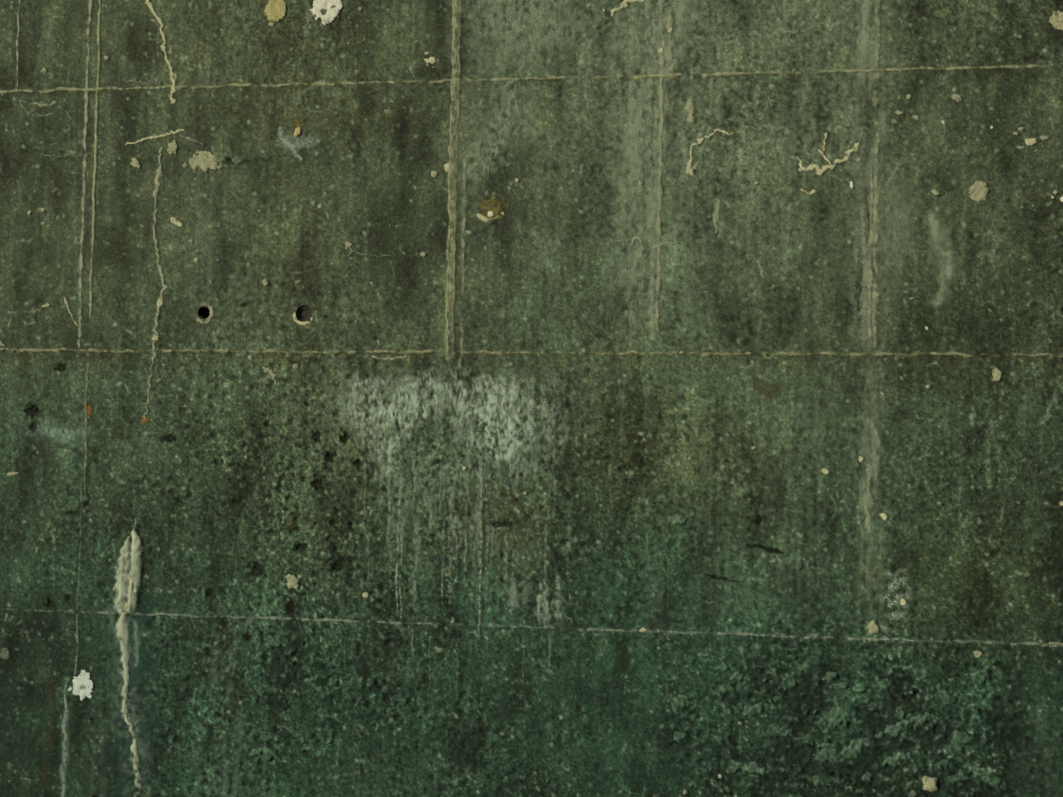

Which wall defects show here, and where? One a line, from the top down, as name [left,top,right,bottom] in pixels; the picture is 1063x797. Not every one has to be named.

crack [119,0,202,418]
crack [602,0,699,73]
crack [796,133,860,194]
damp [107,516,158,788]
damp [343,372,553,631]
damp [537,580,560,618]